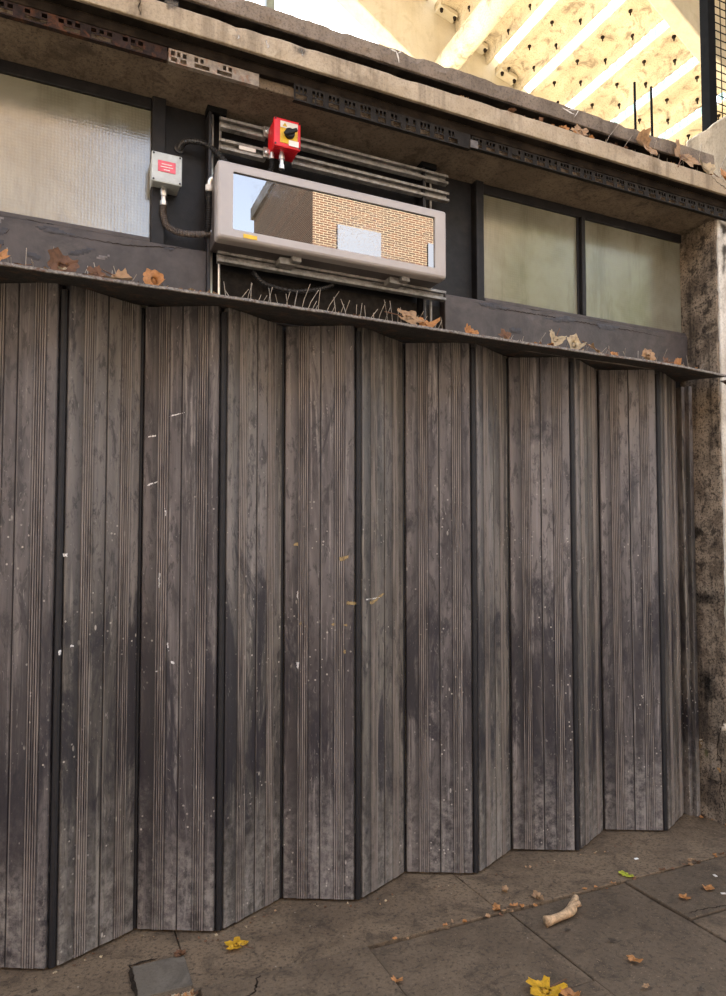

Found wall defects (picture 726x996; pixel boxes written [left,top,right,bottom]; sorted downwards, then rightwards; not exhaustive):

damp [696,592,713,603]